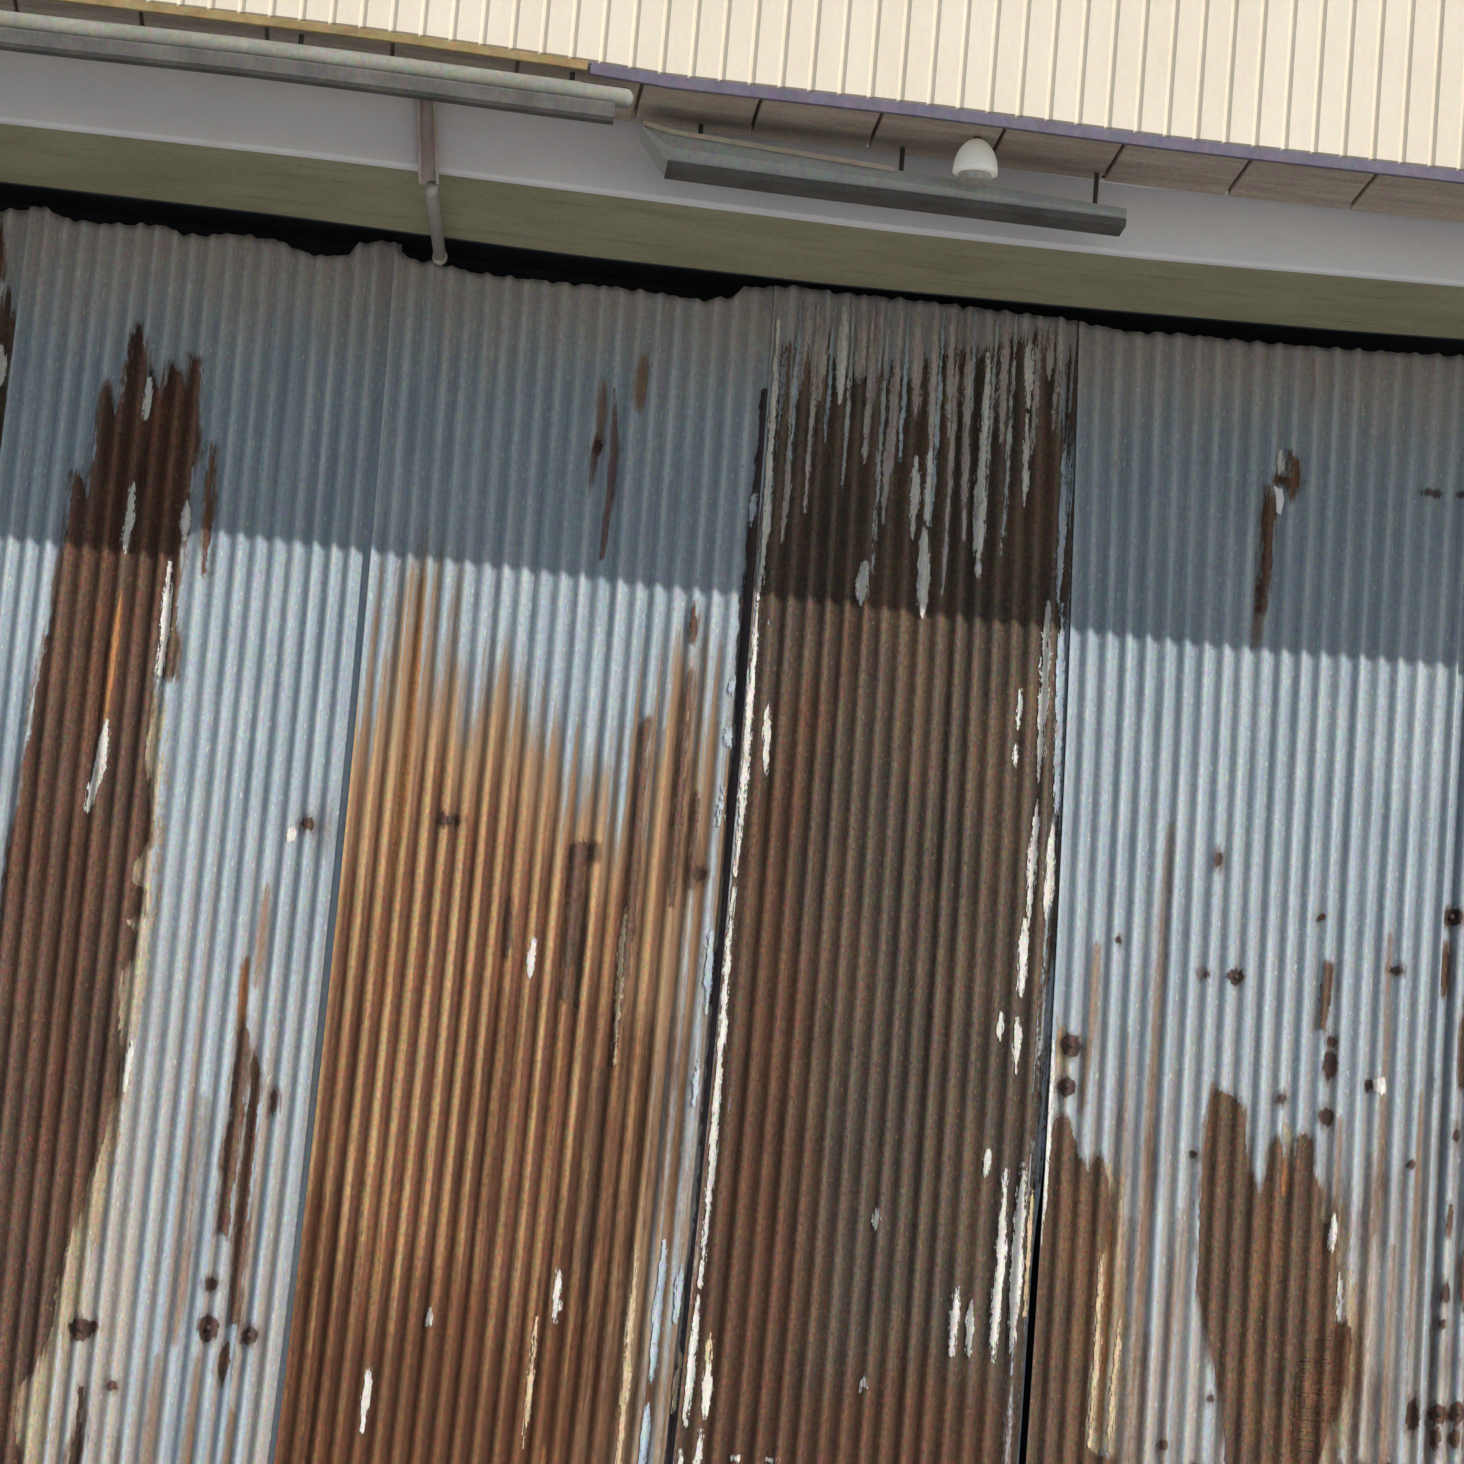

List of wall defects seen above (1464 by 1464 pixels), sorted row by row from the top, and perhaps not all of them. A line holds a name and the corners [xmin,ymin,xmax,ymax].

corrosion [0,215,16,447]
corrosion [1254,449,1300,638]
corrosion [0,325,217,1464]
corrosion [274,301,1177,1464]
corrosion [1203,968,1244,986]
corrosion [1314,960,1339,1081]
corrosion [1387,935,1406,993]
corrosion [1440,908,1464,997]
corrosion [1190,1018,1436,1464]
corrosion [1438,1203,1464,1329]
corrosion [224,1411,234,1464]
corrosion [1405,1397,1464,1452]